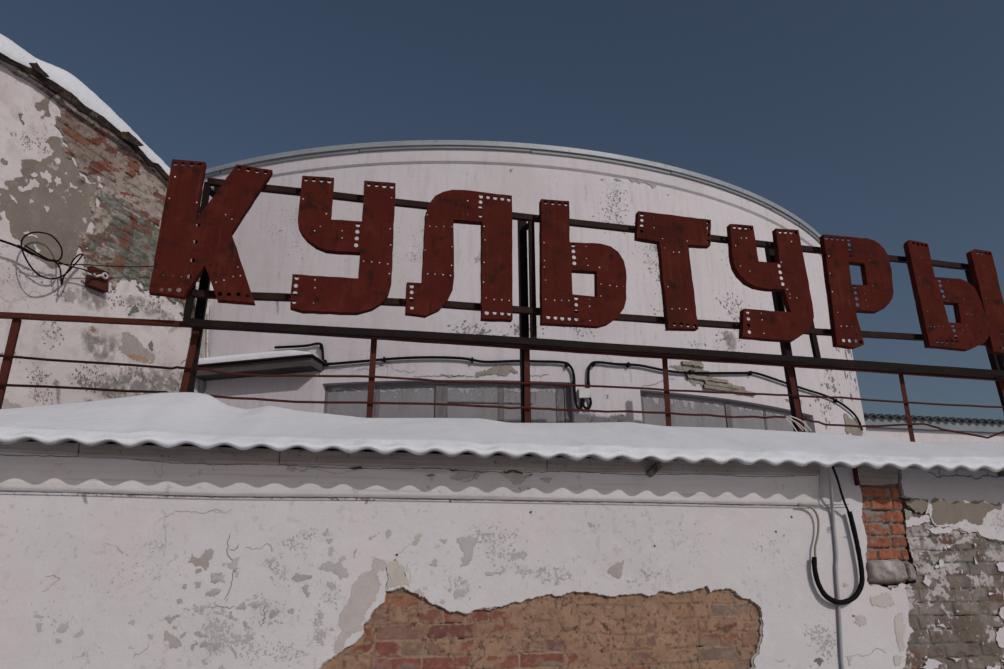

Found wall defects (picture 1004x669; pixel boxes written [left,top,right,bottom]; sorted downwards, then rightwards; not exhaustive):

flaking render [0,97,200,319]
flaking render [669,360,756,396]
peeling [31,575,89,643]
flaking render [148,522,760,669]
crack [116,458,796,609]
peeling [802,624,852,667]
flaking render [870,498,1004,669]